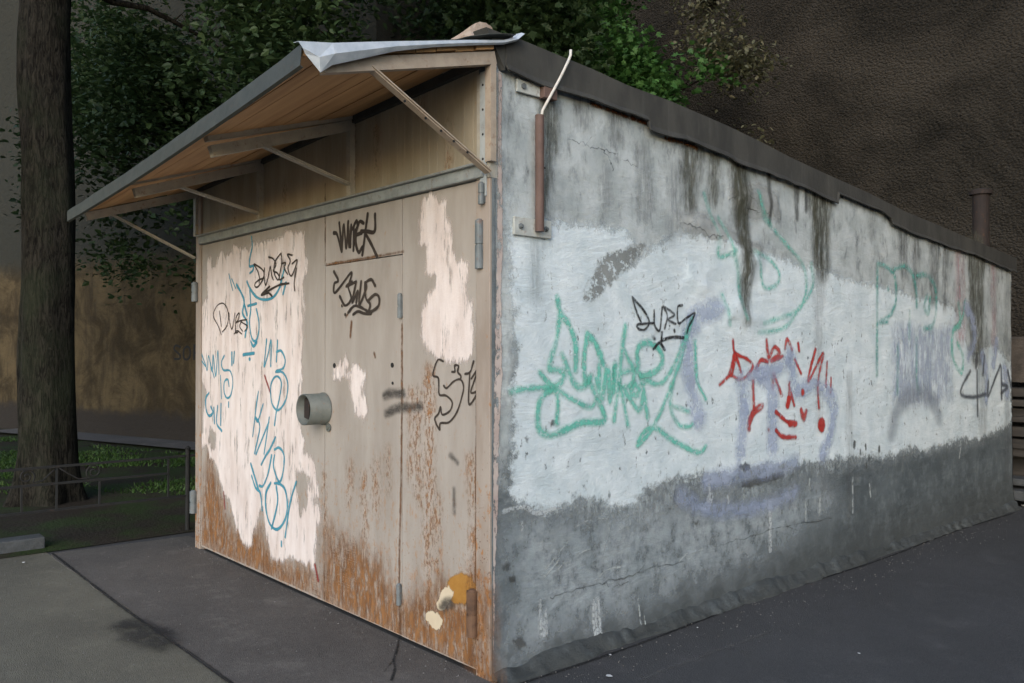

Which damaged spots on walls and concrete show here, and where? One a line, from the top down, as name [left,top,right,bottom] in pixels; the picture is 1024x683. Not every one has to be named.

water stain [684,140,720,208]
water stain [733,162,751,320]
water stain [795,186,831,278]
water stain [969,254,985,365]
rust [202,325,491,682]